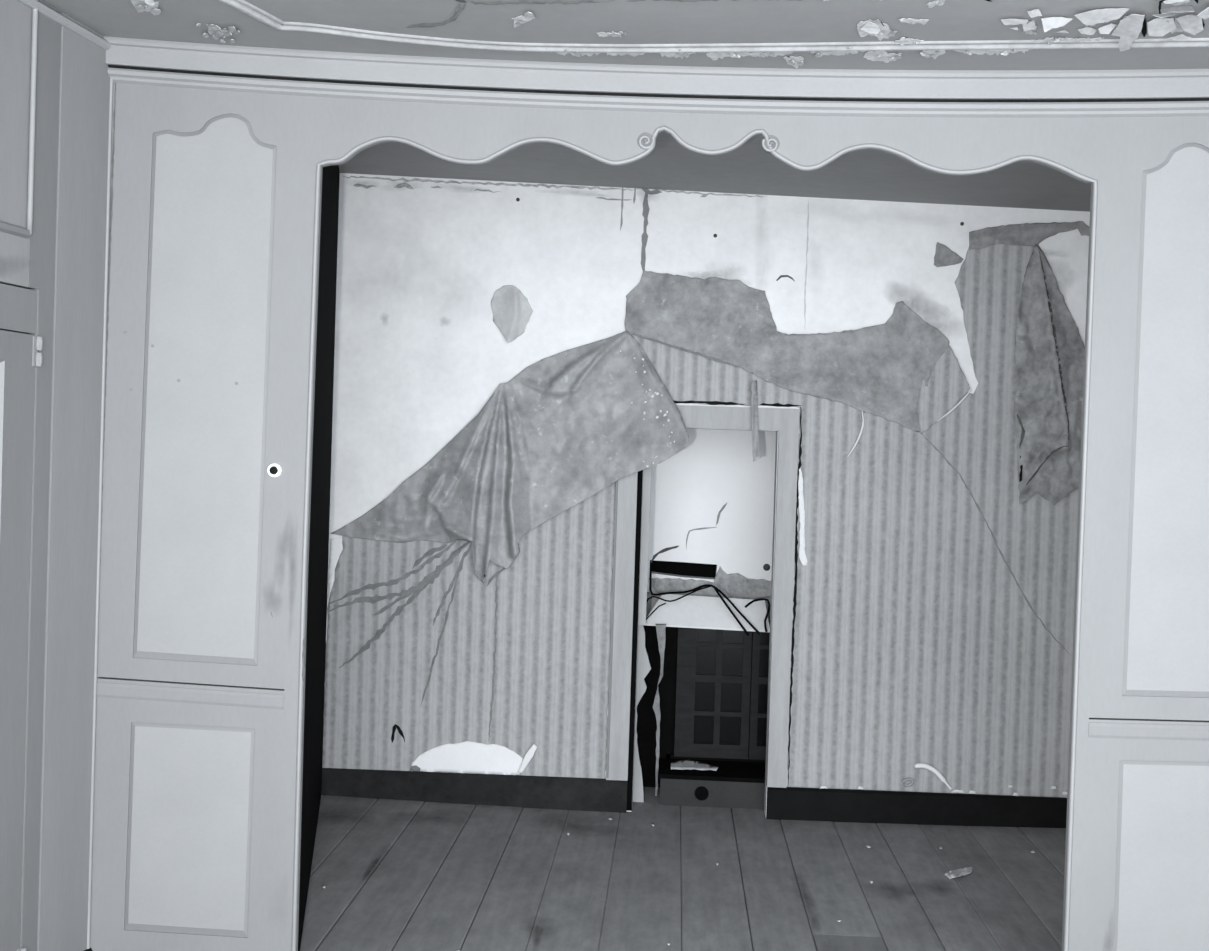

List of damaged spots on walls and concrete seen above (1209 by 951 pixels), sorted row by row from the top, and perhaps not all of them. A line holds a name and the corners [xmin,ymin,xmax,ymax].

crack [406,0,737,28]
peeling [660,0,1209,69]